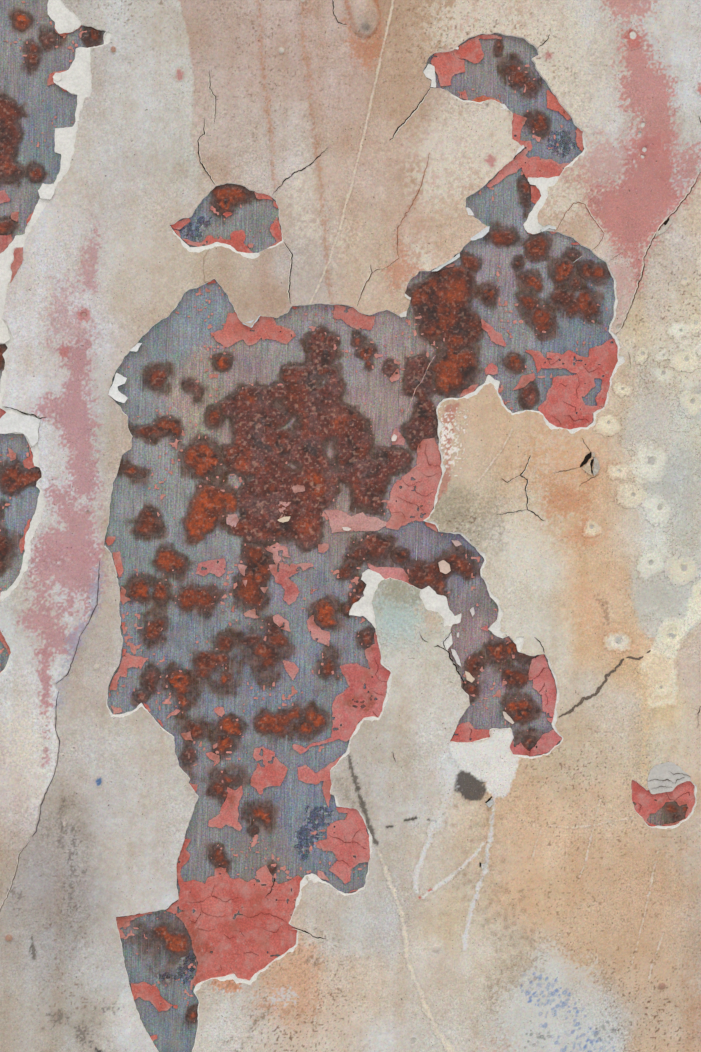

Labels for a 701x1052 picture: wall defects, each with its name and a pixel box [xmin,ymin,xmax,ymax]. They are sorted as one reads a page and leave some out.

corrosion [0,212,22,239]
corrosion [0,83,51,190]
crack [198,74,216,183]
crack [272,151,324,195]
peeling [0,0,112,604]
corrosion [0,446,42,580]
corrosion [115,169,614,842]
peeling [104,33,634,1052]
crack [499,457,545,522]
peeling [0,629,11,677]
crack [532,639,651,717]
peeling [631,761,697,829]